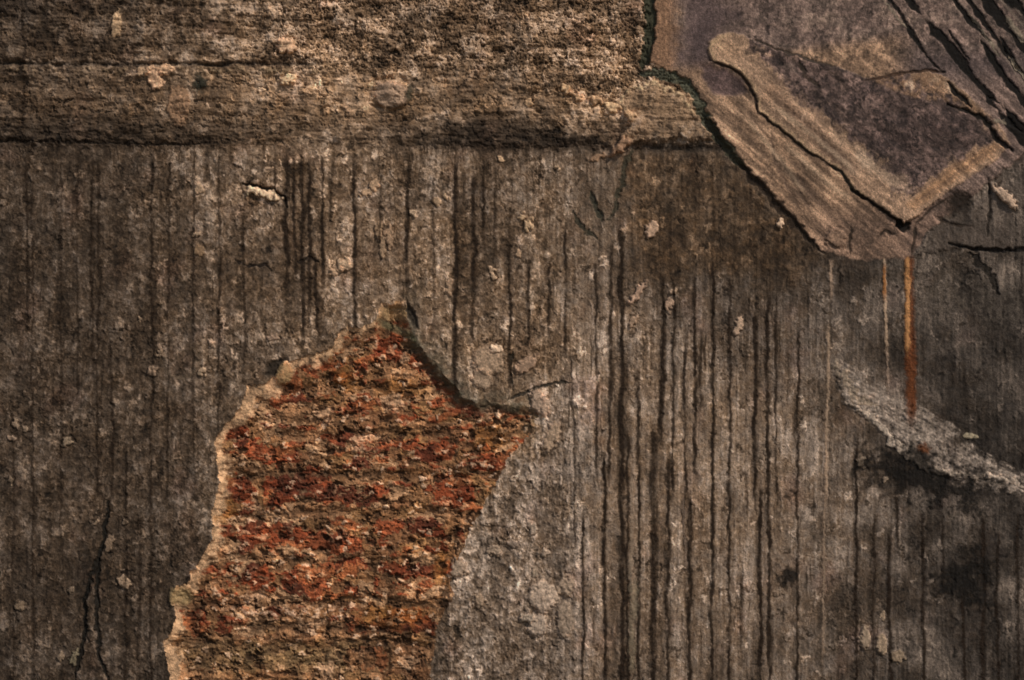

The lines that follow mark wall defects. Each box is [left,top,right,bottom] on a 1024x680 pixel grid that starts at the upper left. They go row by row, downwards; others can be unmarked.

peeling [243,183,287,206]
peeling [645,220,659,238]
peeling [650,0,1024,263]
crack [710,60,1024,295]
corrosion [905,257,916,413]
spalling [163,300,562,680]
crack [75,501,110,680]